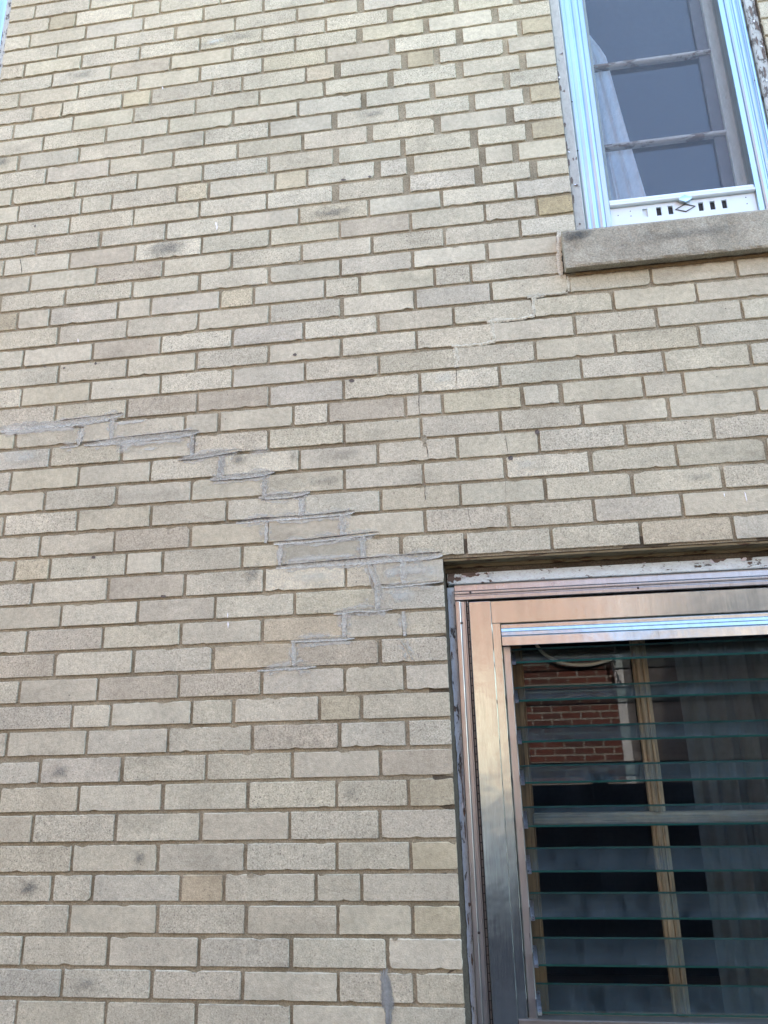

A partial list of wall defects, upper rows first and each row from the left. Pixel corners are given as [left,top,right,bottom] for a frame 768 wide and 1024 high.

crack [0,410,443,673]